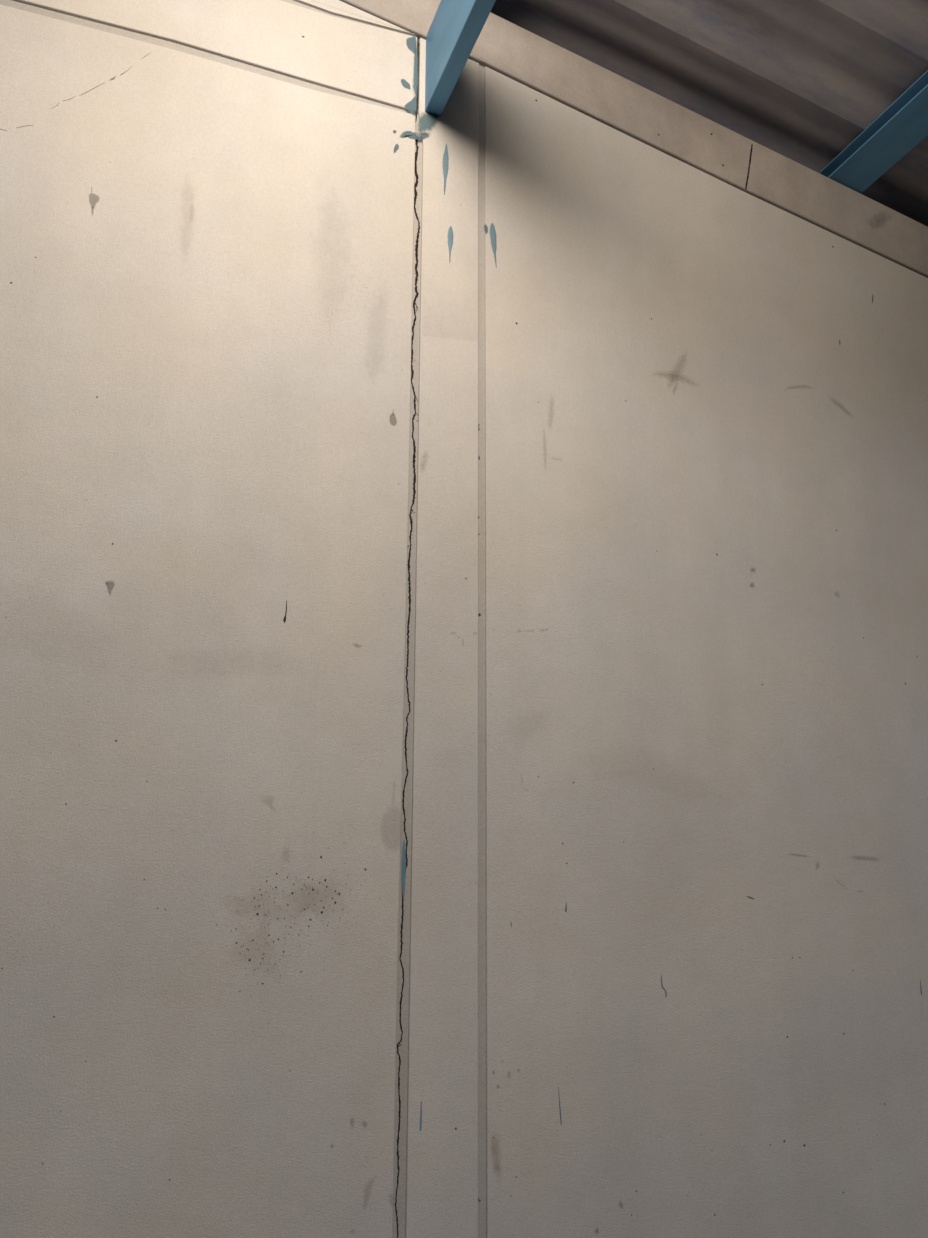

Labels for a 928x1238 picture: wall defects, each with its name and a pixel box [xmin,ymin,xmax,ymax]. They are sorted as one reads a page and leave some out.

crack [395,37,420,1238]